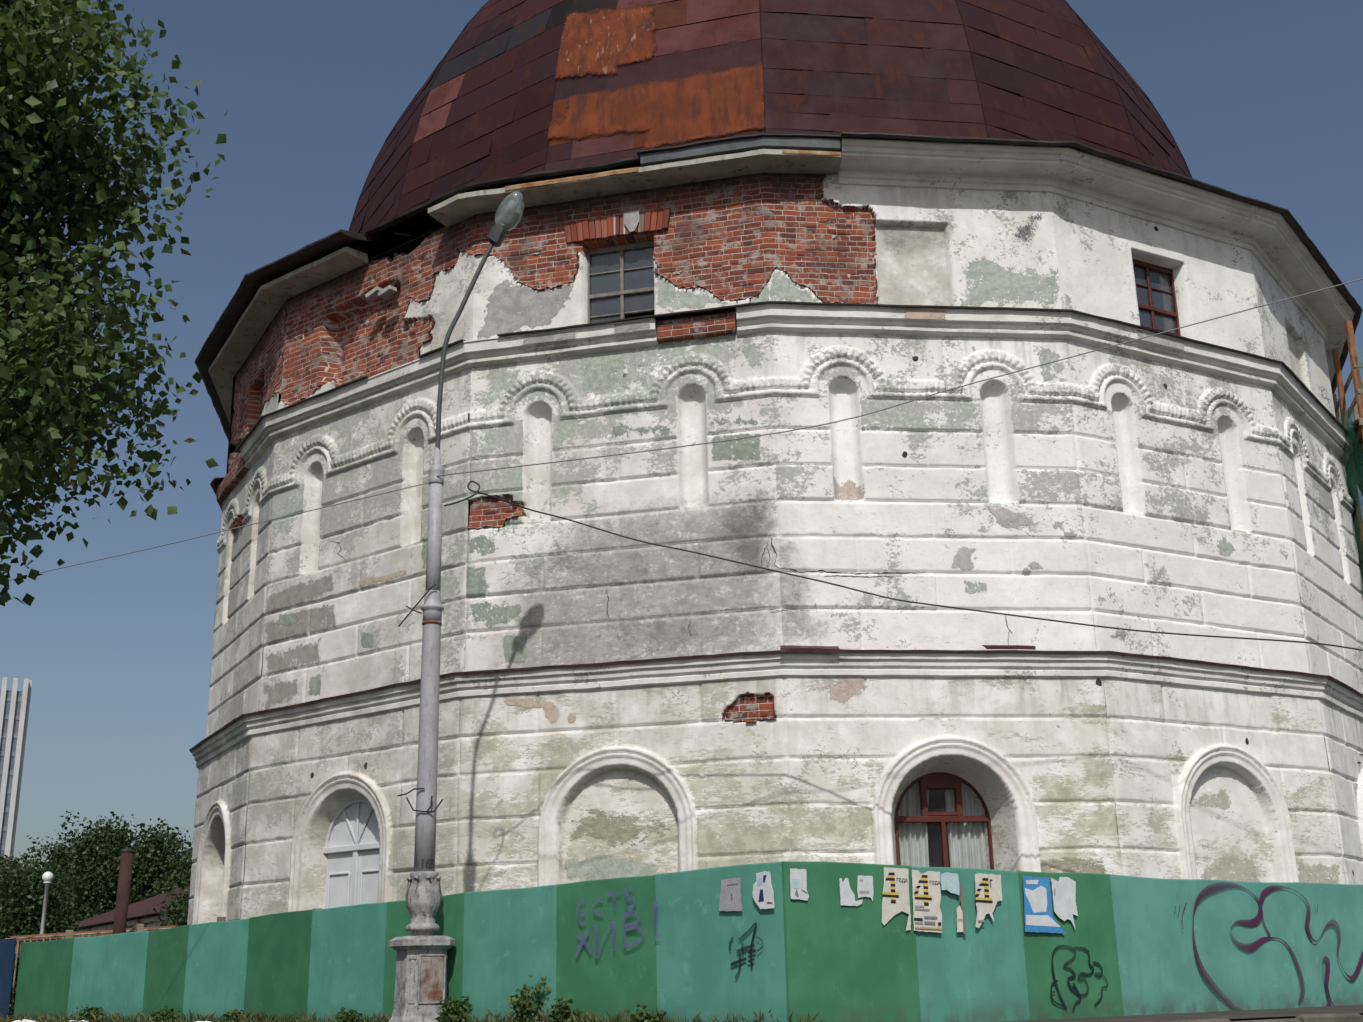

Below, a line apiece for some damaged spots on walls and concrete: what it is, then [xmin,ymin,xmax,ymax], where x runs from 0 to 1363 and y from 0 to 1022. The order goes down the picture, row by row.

corrosion [555,7,657,79]
corrosion [548,64,765,149]
flaking render [905,309,945,319]
peeling [960,256,1060,309]
flaking render [216,173,879,533]
flaking render [466,494,527,664]
flaking render [722,692,777,722]
peeling [565,809,671,881]